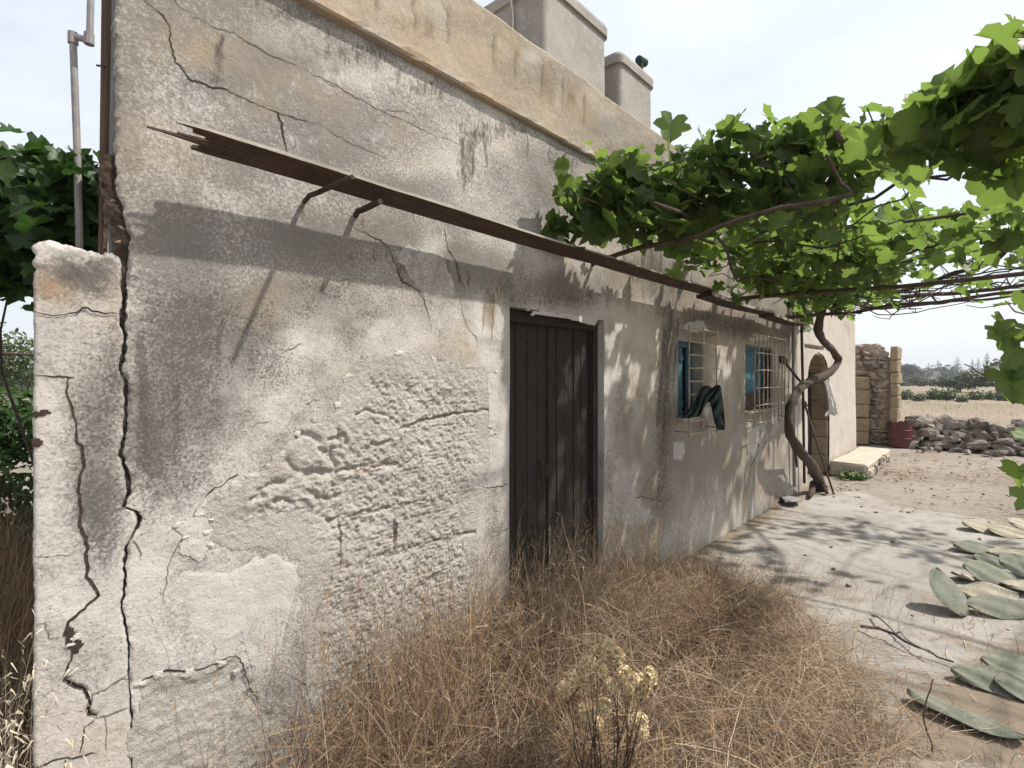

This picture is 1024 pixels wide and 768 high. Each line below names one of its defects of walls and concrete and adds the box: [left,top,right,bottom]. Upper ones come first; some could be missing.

crack [145,0,459,159]
crack [354,227,431,324]
crack [445,230,478,343]
crack [34,152,259,768]
flaking render [126,350,499,768]